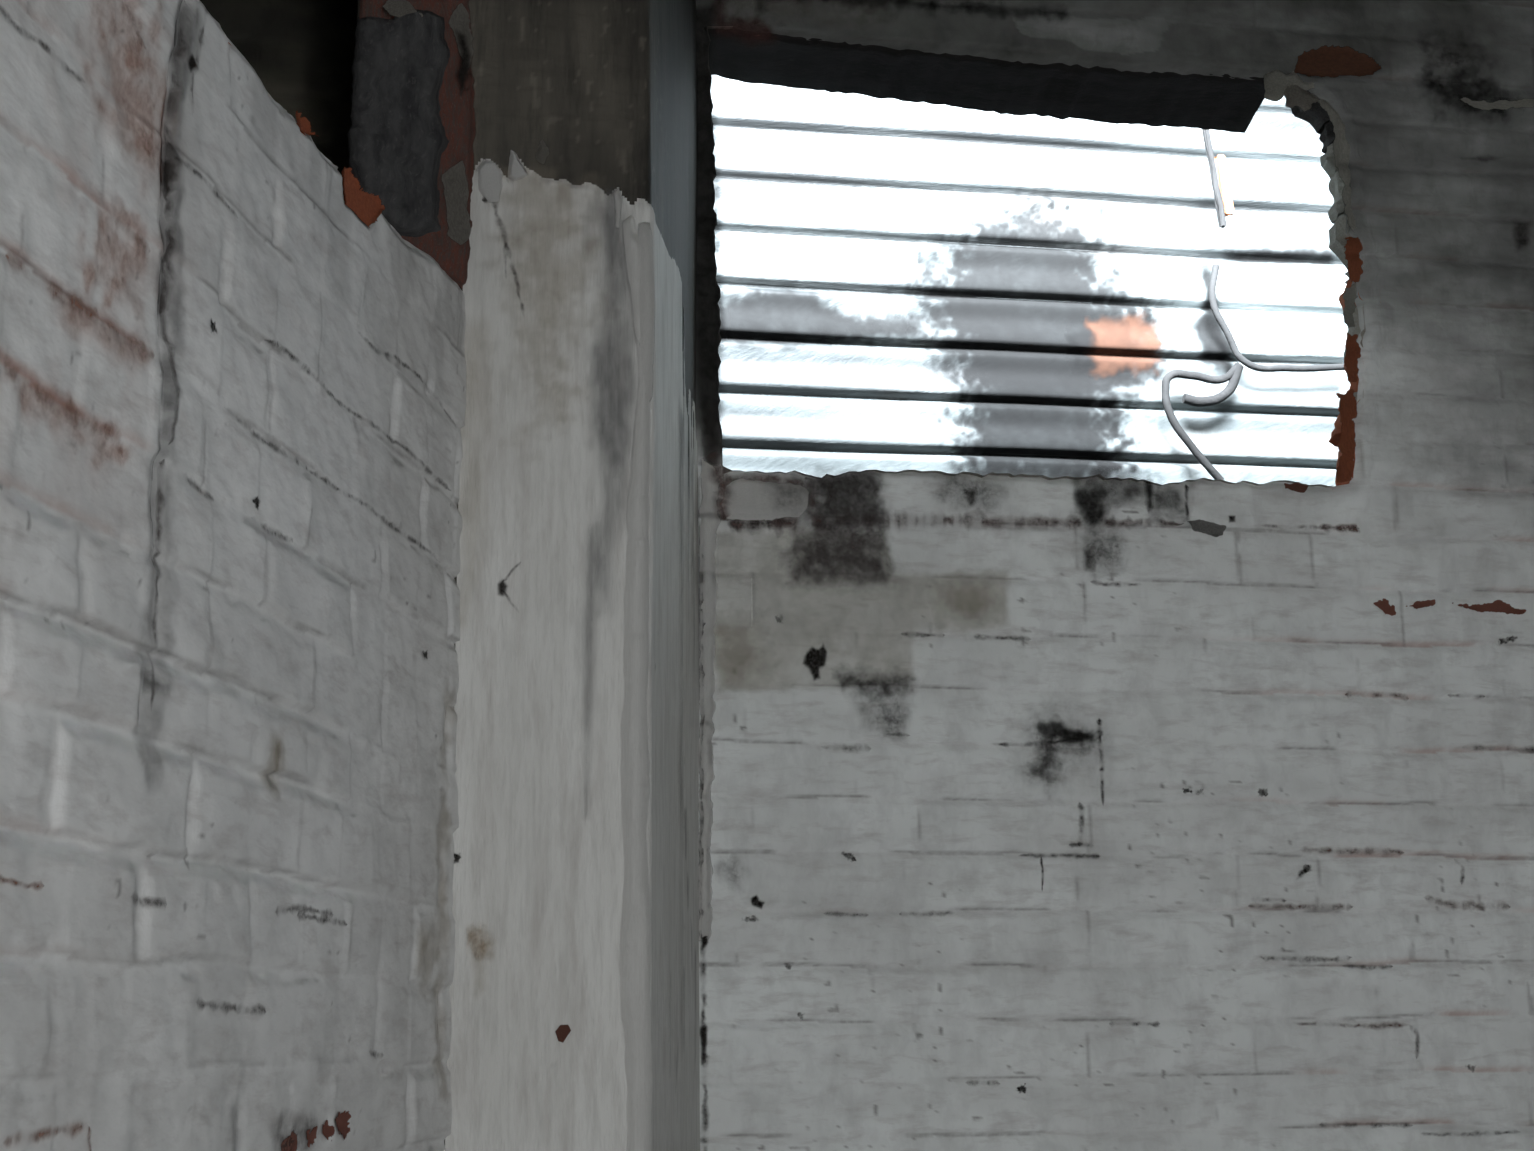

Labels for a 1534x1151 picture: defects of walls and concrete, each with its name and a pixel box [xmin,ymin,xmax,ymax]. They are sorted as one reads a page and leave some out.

damp [847,0,1007,16]
damp [1460,97,1534,110]
spalling [341,167,385,228]
spalling [1264,45,1382,486]
spalling [1284,482,1309,493]
peeling [1374,598,1526,616]
spalling [281,1111,351,1151]